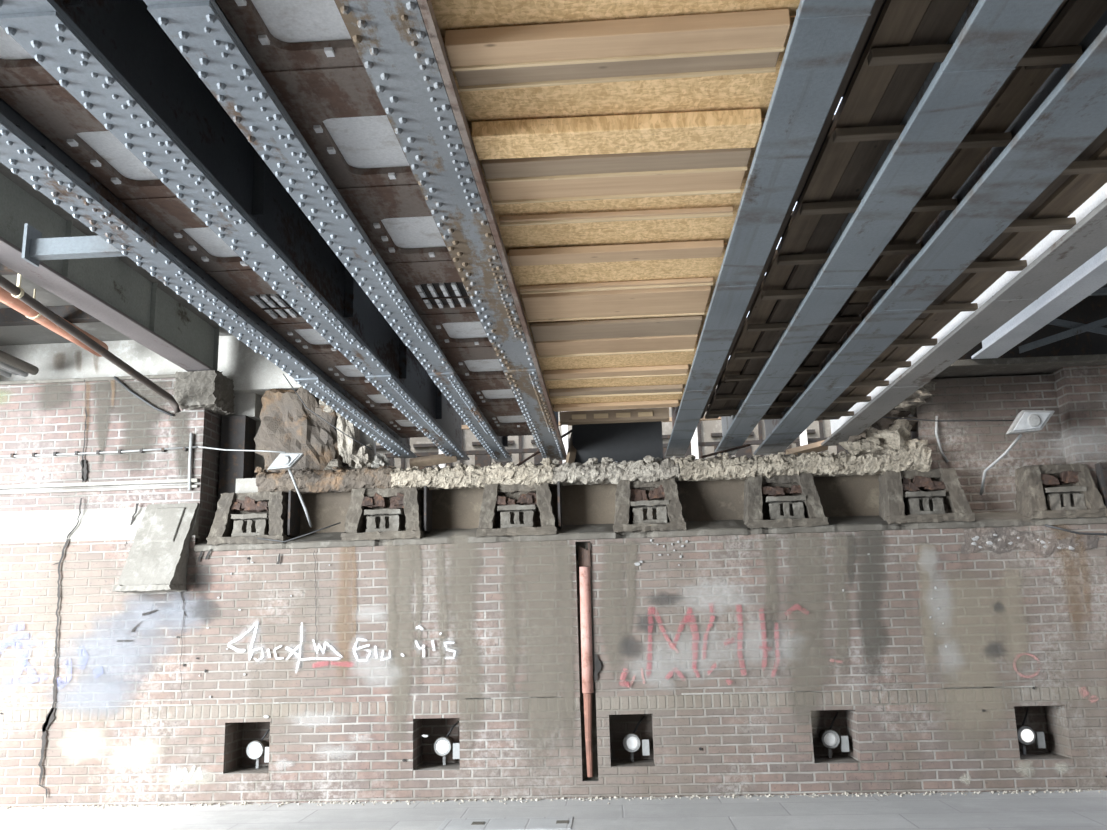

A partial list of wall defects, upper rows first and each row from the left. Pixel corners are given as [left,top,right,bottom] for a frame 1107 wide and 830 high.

spalling [254,380,937,494]
crack [38,379,87,798]
water stain [790,530,884,707]
water stain [919,544,1026,728]
spalling [961,527,1099,558]